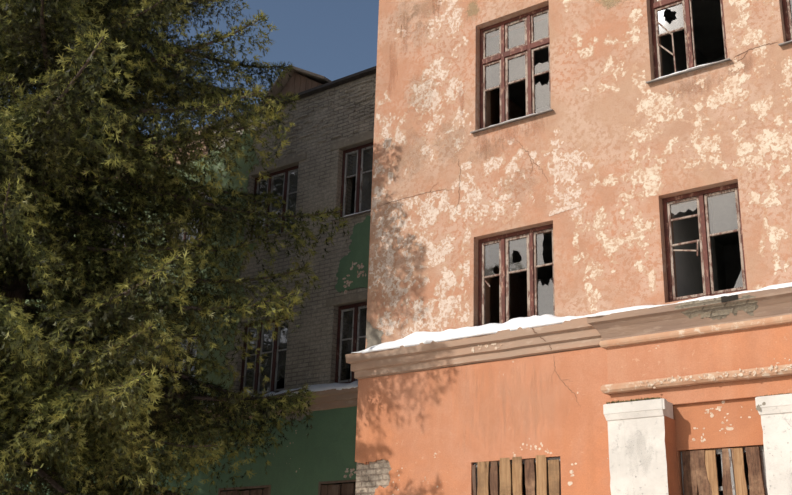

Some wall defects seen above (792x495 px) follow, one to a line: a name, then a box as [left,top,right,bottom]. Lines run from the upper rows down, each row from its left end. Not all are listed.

peeling [335,0,792,349]
peeling [639,358,792,389]
spalling [344,448,403,495]